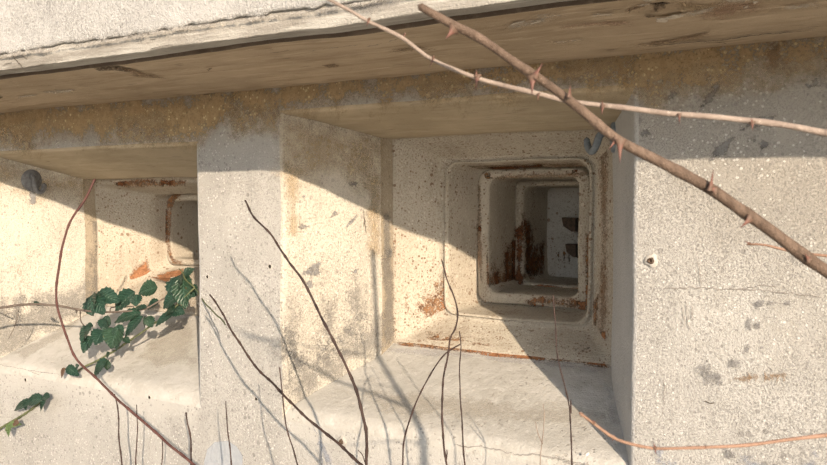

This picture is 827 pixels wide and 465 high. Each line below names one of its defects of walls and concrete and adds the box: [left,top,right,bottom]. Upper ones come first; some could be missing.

spalling [627,0,684,23]
water stain [0,33,827,145]
rust [114,179,186,282]
rust [486,215,598,325]
rust [393,331,609,368]